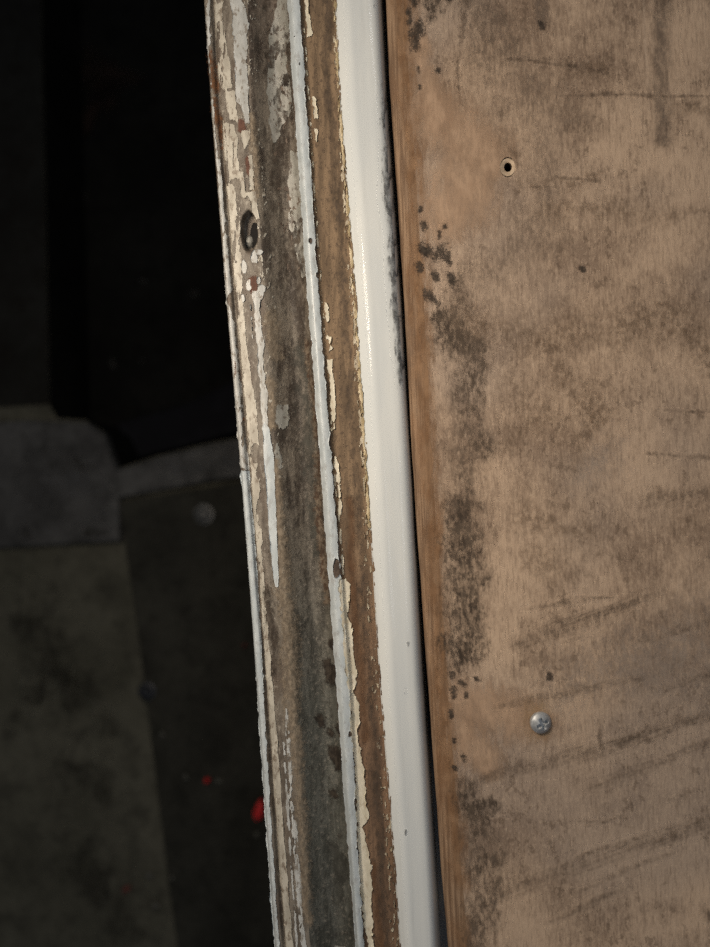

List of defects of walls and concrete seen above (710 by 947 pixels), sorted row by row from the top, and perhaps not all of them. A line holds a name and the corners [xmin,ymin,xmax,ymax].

peeling [205,0,374,947]
peeling [332,0,401,947]
leakage [397,0,502,947]